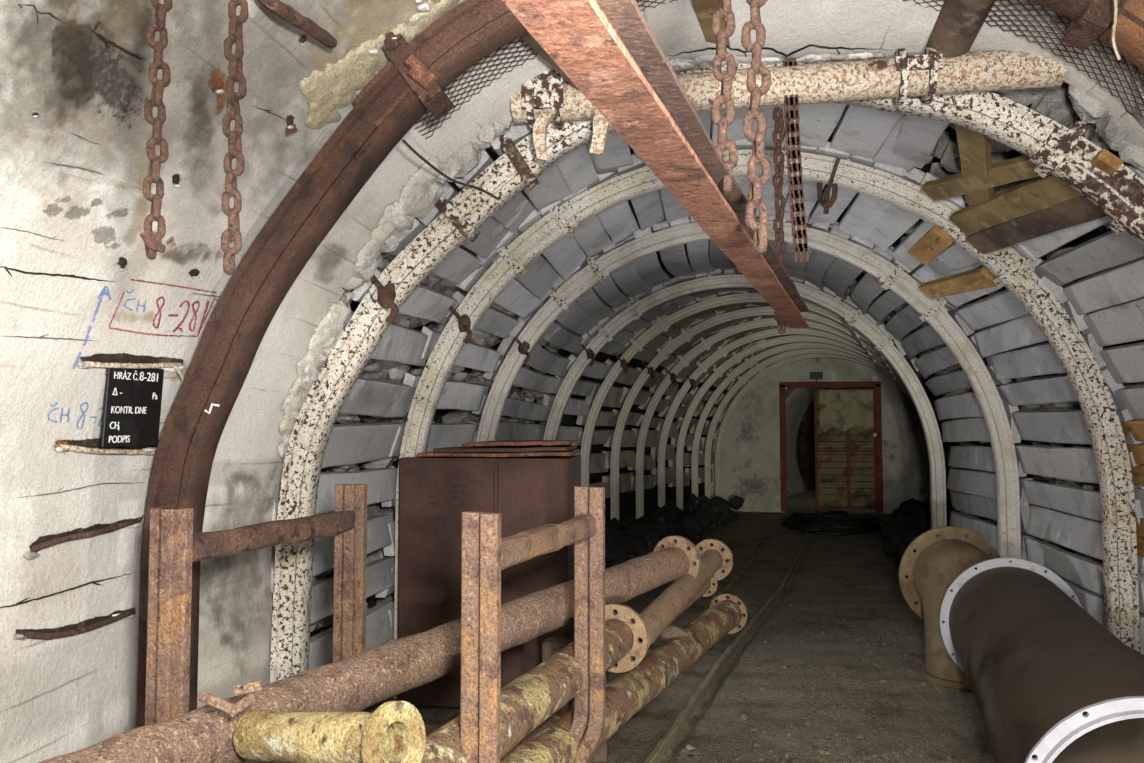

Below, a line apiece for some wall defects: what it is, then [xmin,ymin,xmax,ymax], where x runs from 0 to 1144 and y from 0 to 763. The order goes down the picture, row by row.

crack [18,4,147,61]
damp [52,18,146,129]
crack [1,227,68,242]
crack [0,266,113,282]
corrosion [417,440,580,457]